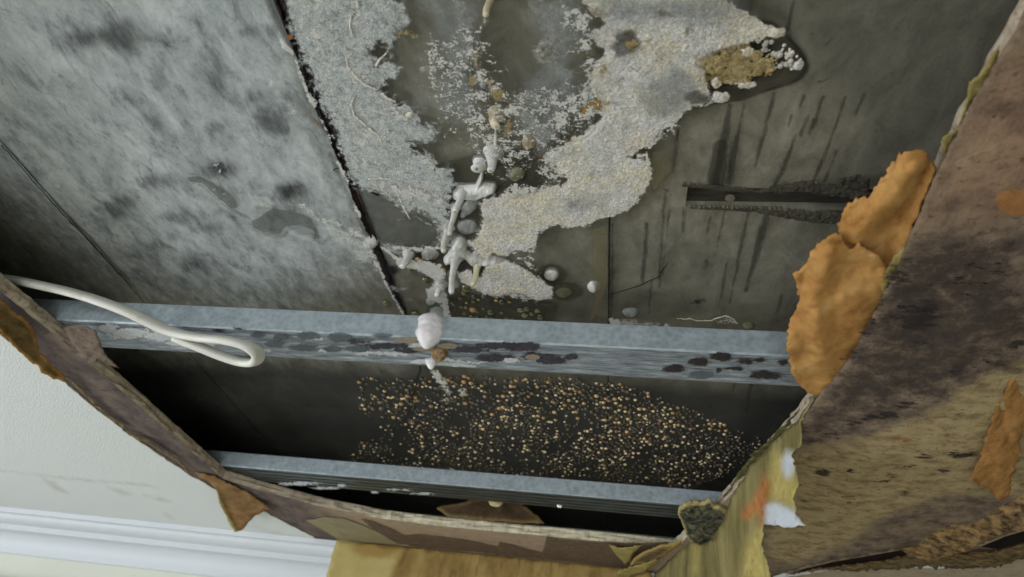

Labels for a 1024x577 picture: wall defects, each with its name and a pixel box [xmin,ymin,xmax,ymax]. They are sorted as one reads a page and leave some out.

leakage [69,26,131,49]
leakage [188,0,808,317]
leakage [773,96,824,187]
mould [822,402,917,439]